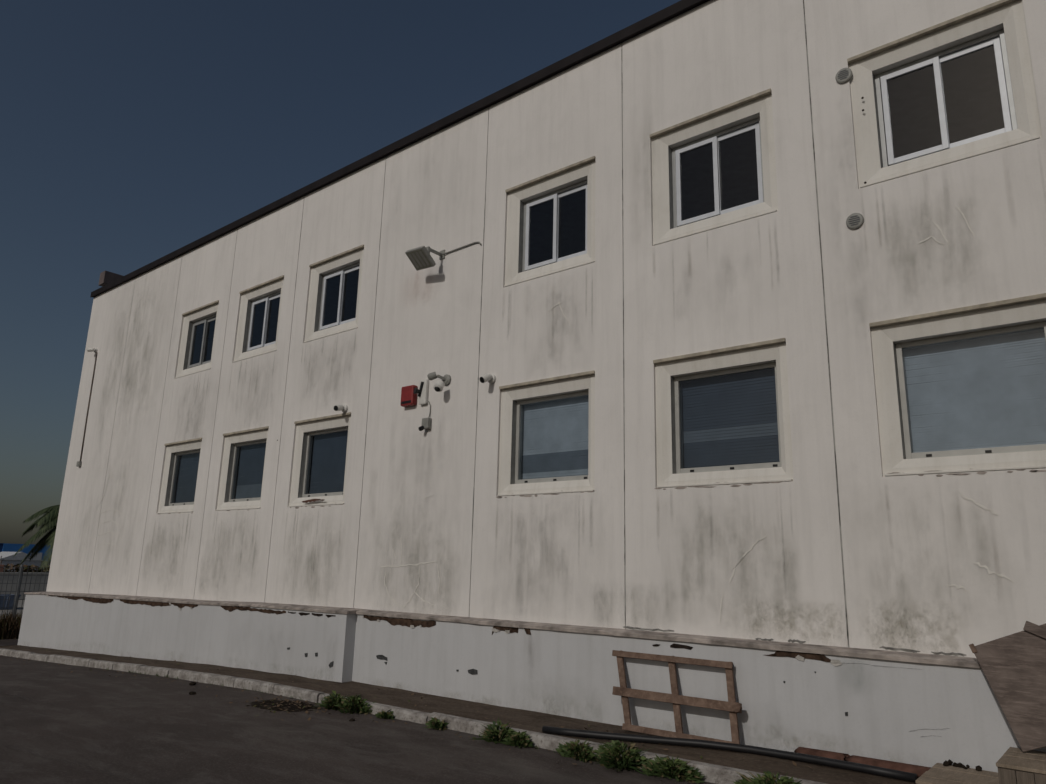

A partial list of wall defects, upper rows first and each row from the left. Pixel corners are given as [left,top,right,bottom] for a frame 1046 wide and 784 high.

flaking render [221,606,336,617]
flaking render [362,615,436,628]
flaking render [492,626,531,635]
flaking render [766,651,842,673]